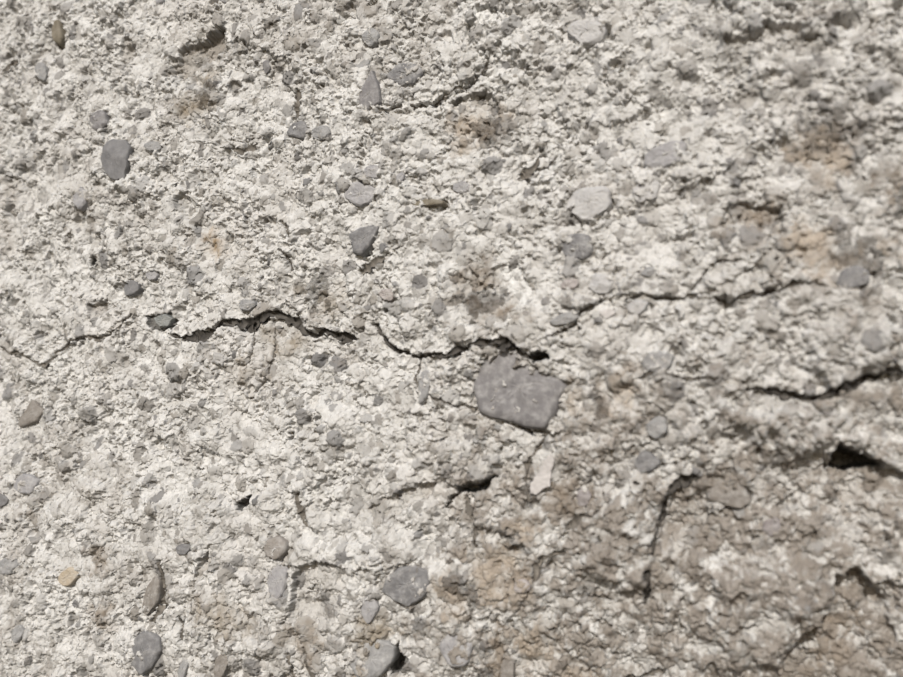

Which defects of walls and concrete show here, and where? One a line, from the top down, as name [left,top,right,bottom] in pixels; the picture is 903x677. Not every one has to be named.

crack [1,313,132,368]
crack [171,259,829,412]
crack [745,368,903,400]
crack [643,475,694,604]